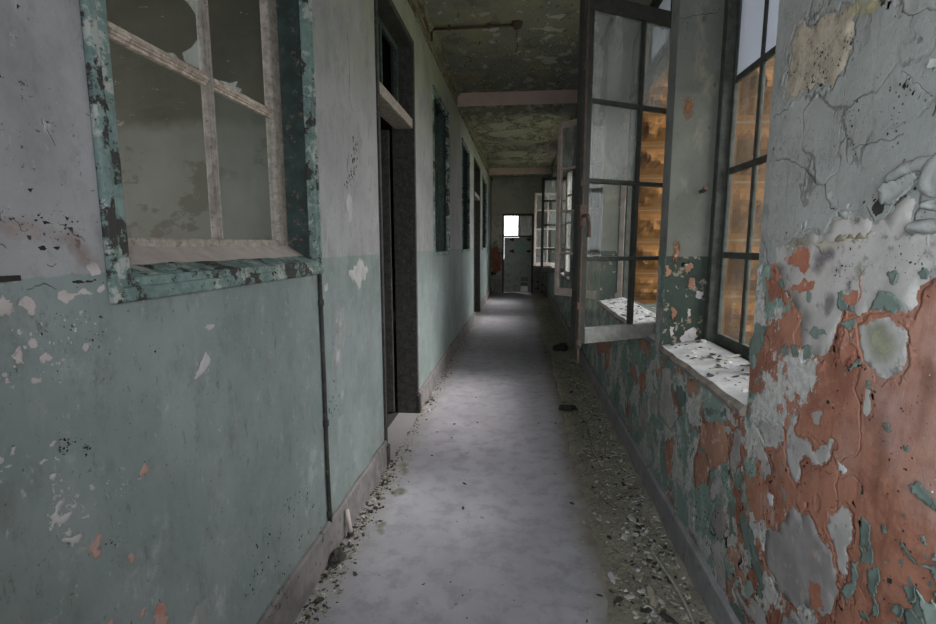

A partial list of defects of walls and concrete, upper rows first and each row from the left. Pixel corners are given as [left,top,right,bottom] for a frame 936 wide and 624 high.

peeling [474,115,555,164]
crack [770,58,936,220]
flaking render [773,0,936,123]
peeling [0,207,105,389]
peeling [663,259,704,299]
peeling [757,153,936,423]
flaking render [595,291,892,624]
peeling [890,584,925,624]